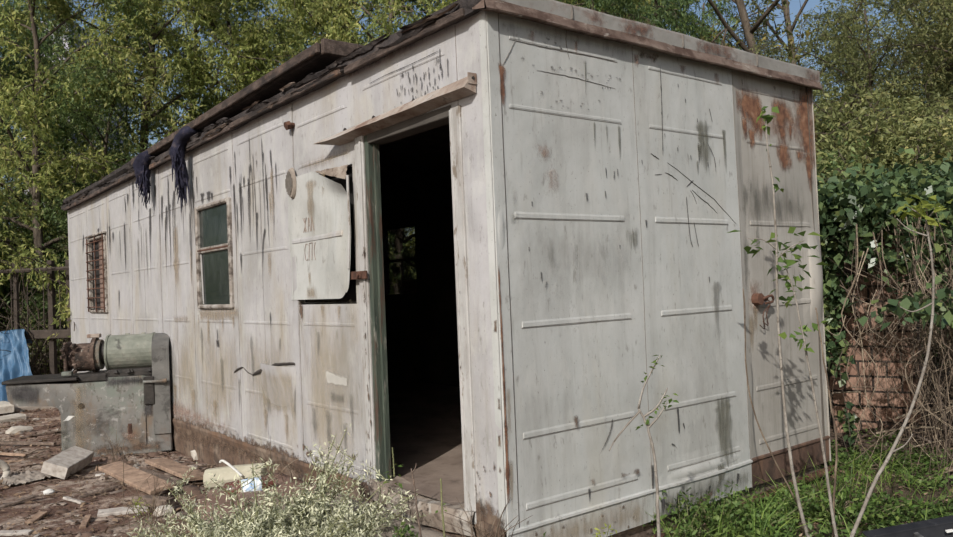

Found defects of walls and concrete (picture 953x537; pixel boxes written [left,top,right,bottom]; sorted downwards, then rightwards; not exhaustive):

water stain [96,171,213,268]
water stain [229,140,277,259]
water stain [697,123,708,167]
corrosion [737,74,818,187]